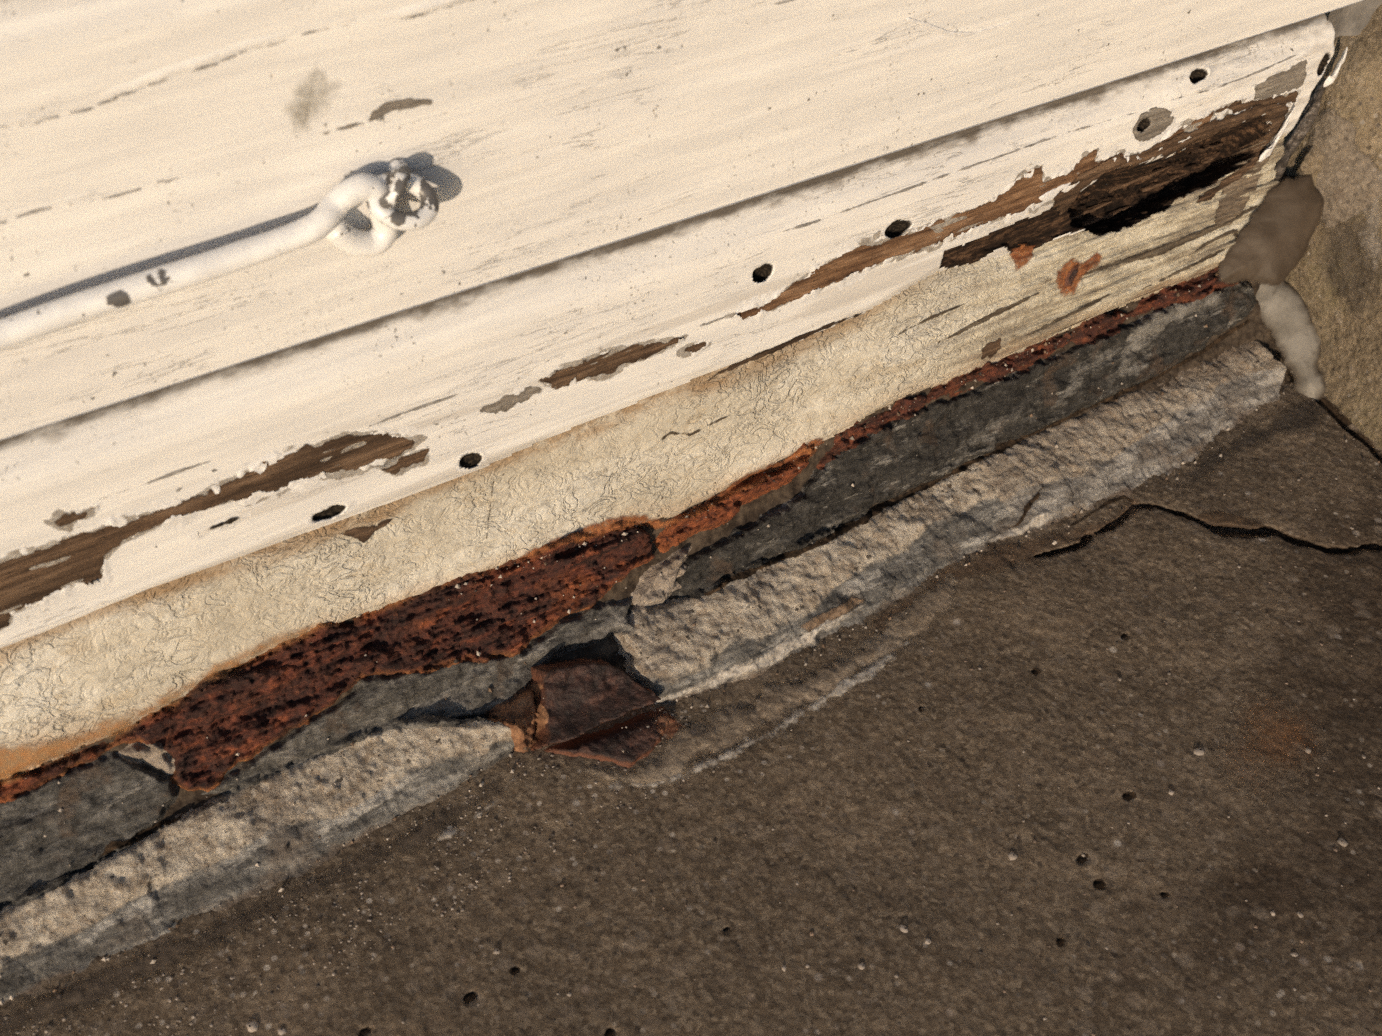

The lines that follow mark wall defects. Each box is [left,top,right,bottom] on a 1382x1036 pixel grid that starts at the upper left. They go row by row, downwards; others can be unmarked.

peeling [1323,47,1348,87]
spalling [325,98,432,135]
spalling [725,60,1307,327]
rust [1056,253,1101,294]
peeling [480,334,711,414]
crack [1289,371,1382,463]
peeling [0,424,430,631]
rust [0,266,1241,803]
crack [1010,486,1044,529]
crack [1033,495,1382,558]